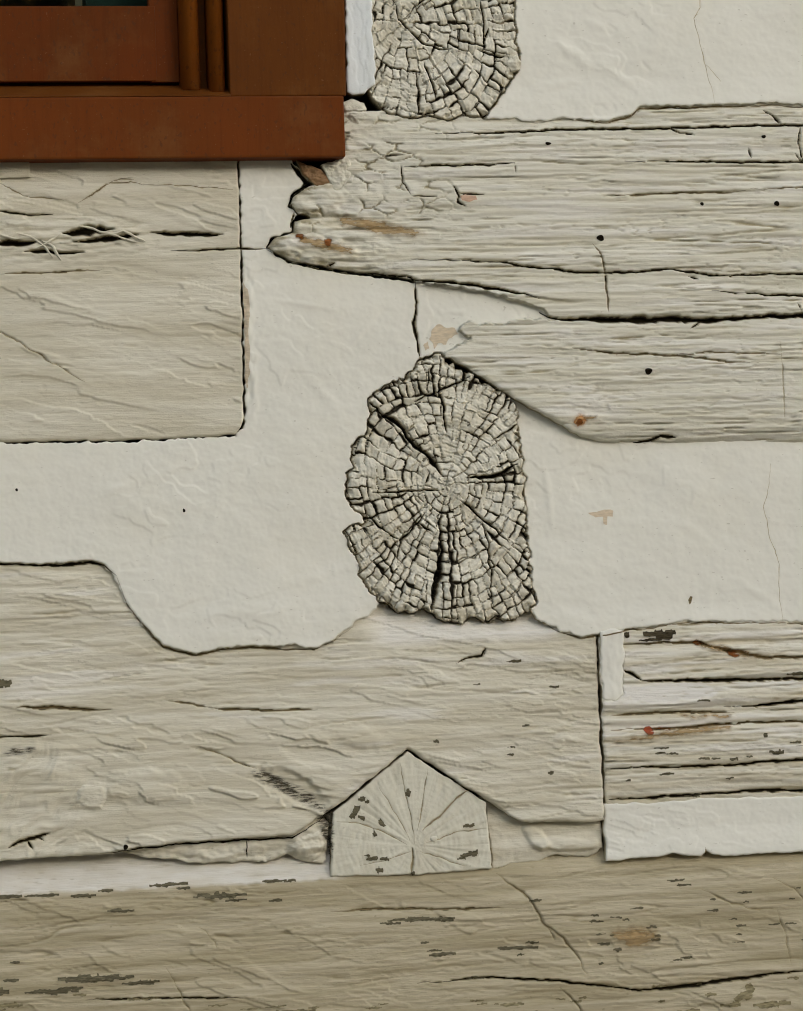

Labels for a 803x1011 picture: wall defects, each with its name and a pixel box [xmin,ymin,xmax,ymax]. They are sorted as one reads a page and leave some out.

crack [392,0,449,115]
crack [435,0,803,164]
crack [289,164,308,228]
crack [388,155,516,206]
crack [0,178,803,432]
crack [368,408,508,604]
crack [470,464,517,487]
crack [633,435,676,443]
crack [540,464,803,731]
crack [609,789,803,800]
crack [613,759,803,769]
crack [417,873,801,1011]